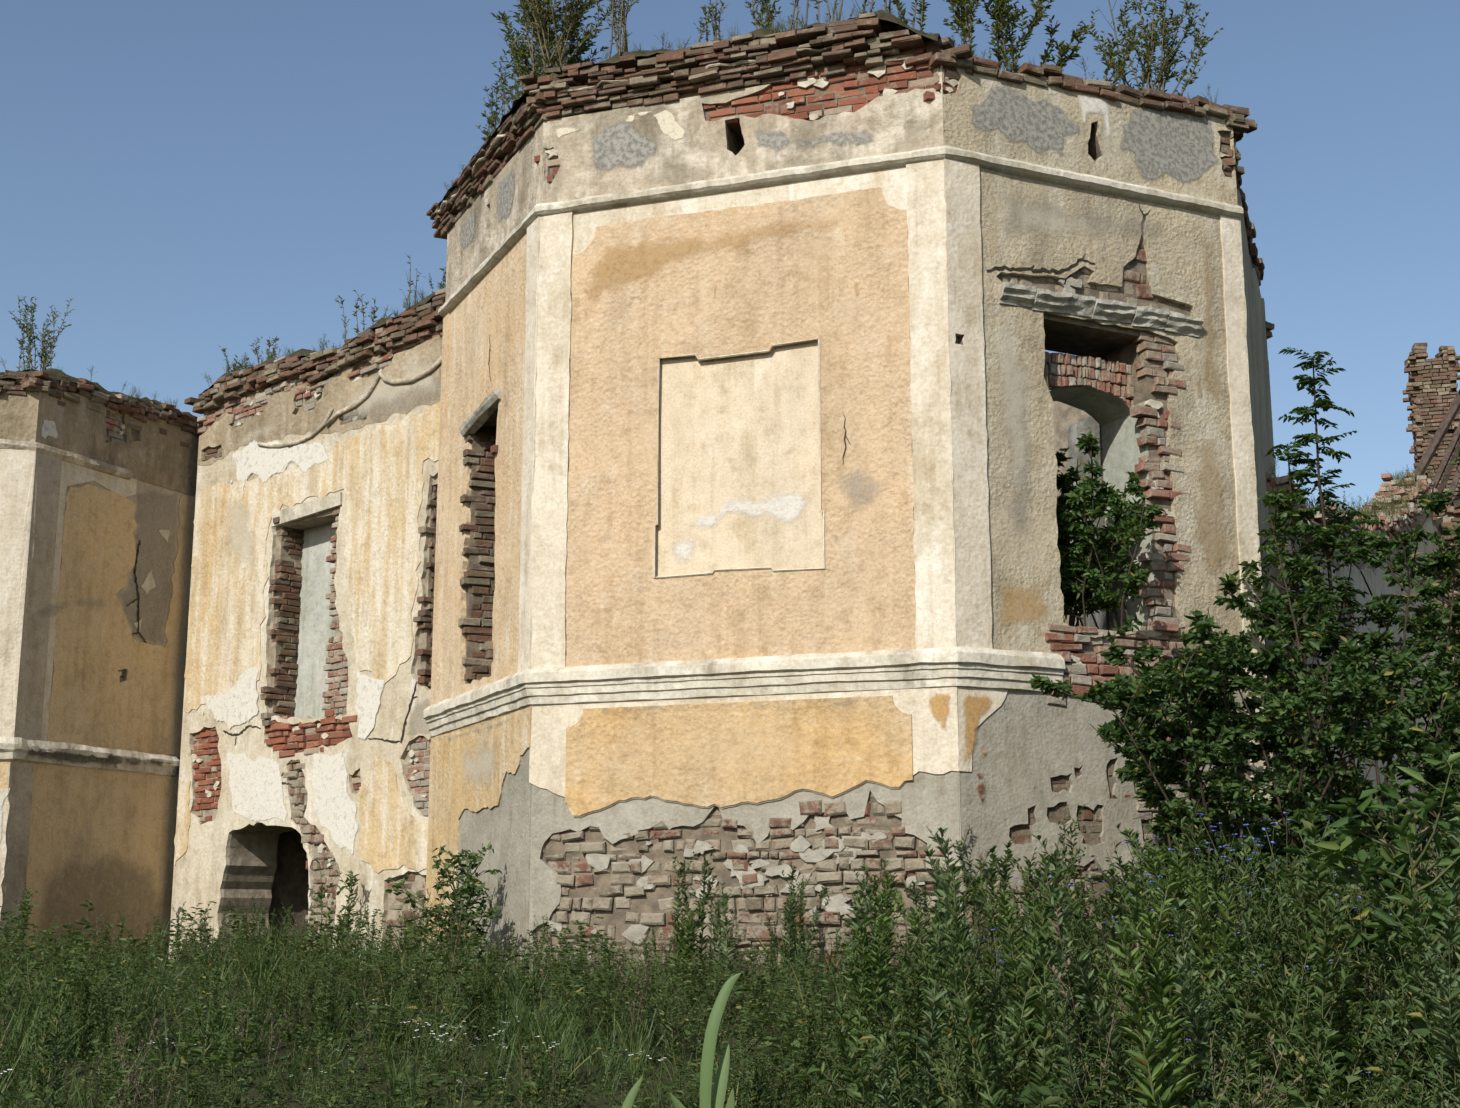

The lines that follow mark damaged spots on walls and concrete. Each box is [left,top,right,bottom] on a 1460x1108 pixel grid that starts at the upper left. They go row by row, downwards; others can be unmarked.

flaking render [704,49,959,128]
flaking render [1002,237,1185,309]
flaking render [295,379,327,412]
flaking render [341,351,432,425]
flaking render [202,392,329,499]
crack [127,540,153,645]
flaking render [141,570,156,595]
flaking render [531,332,1202,980]
flaking render [191,666,385,944]
flaking render [406,736,431,816]